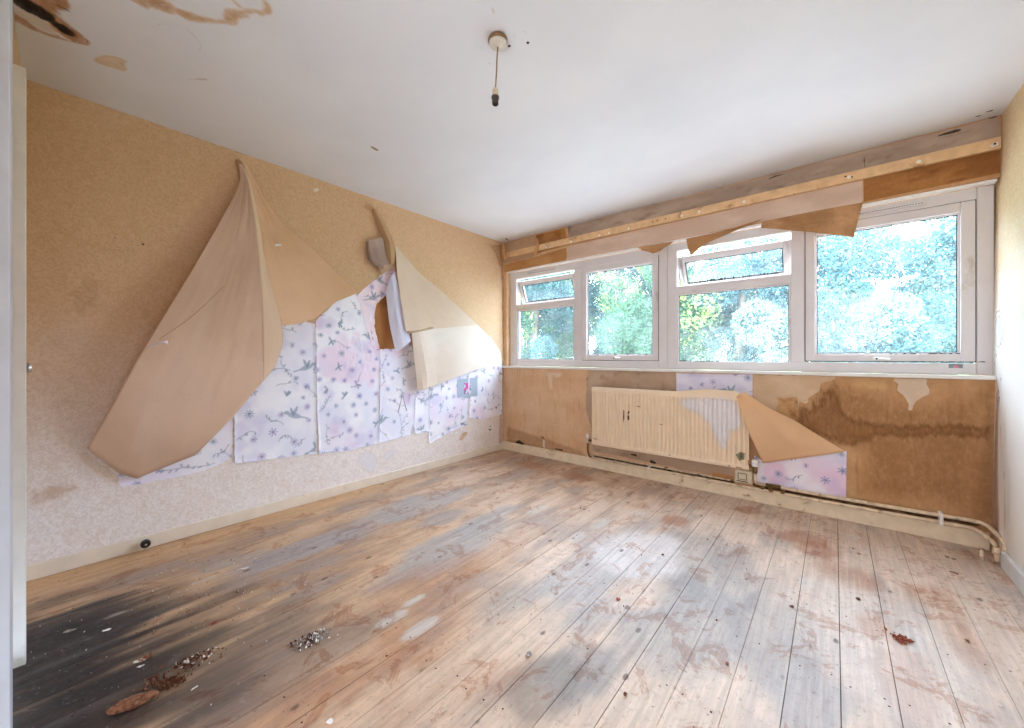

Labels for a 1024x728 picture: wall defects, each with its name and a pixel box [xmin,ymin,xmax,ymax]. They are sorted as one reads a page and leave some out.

peeling [371,208,395,265]
flaking render [374,295,395,349]
peeling [737,392,844,463]
leakage [794,375,1009,562]